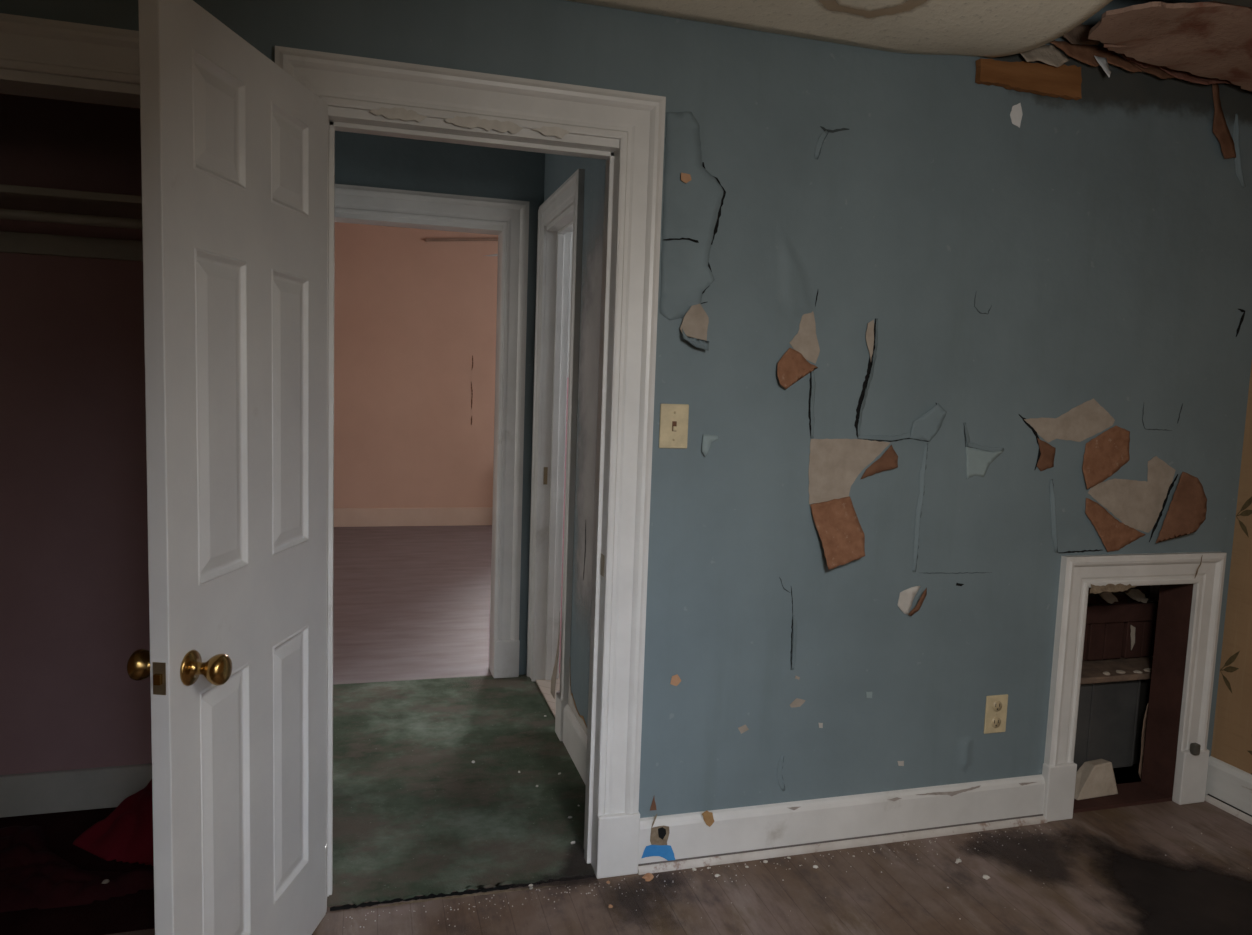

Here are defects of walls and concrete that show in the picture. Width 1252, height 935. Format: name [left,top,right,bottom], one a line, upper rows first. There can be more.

water stain [820,0,927,18]
peeling [1010,103,1023,128]
crack [808,371,816,438]
crack [854,318,929,442]
crack [963,423,1004,451]
peeling [1024,398,1115,443]
peeling [808,439,890,504]
peeling [1088,456,1176,533]
crack [779,577,797,670]
peeling [898,586,921,615]
water stain [973,834,1071,880]
water stain [1088,837,1252,935]